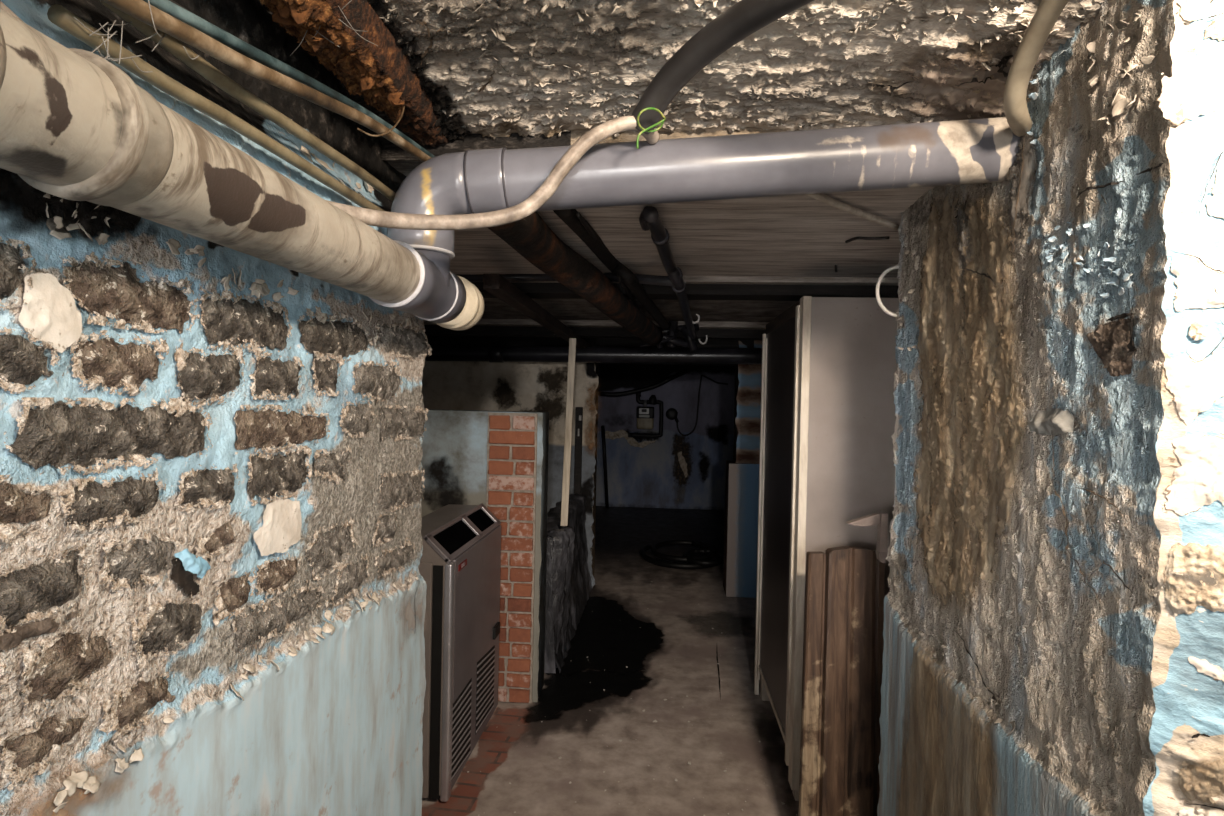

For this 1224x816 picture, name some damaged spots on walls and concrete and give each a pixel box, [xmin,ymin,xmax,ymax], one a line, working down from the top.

corrosion [259,0,406,123]
peeling [979,18,1031,71]
peeling [1087,41,1100,91]
peeling [1104,13,1141,43]
peeling [1044,222,1134,298]
peeling [1171,253,1224,340]
spalling [1086,313,1137,377]
damp [494,367,568,429]
peeling [1164,348,1224,516]
spalling [0,193,432,813]
damp [672,434,710,504]
spalling [1178,759,1224,816]